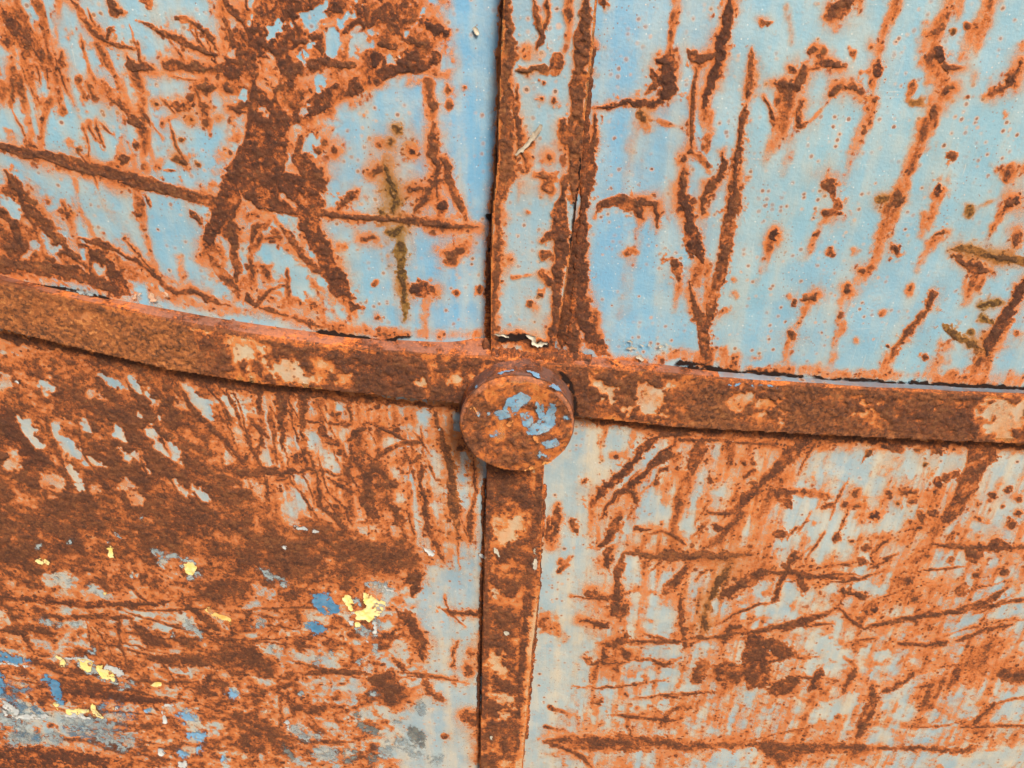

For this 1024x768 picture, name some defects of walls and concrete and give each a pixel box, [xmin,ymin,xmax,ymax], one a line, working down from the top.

rust [982,40,1024,100]
rust [0,0,474,341]
rust [462,0,997,380]
rust [988,161,1024,250]
rust [0,276,1024,768]
peeling [151,549,201,581]
peeling [260,568,288,588]
peeling [171,620,203,638]
peeling [304,581,394,666]
peeling [0,647,208,768]
peeling [284,702,444,764]